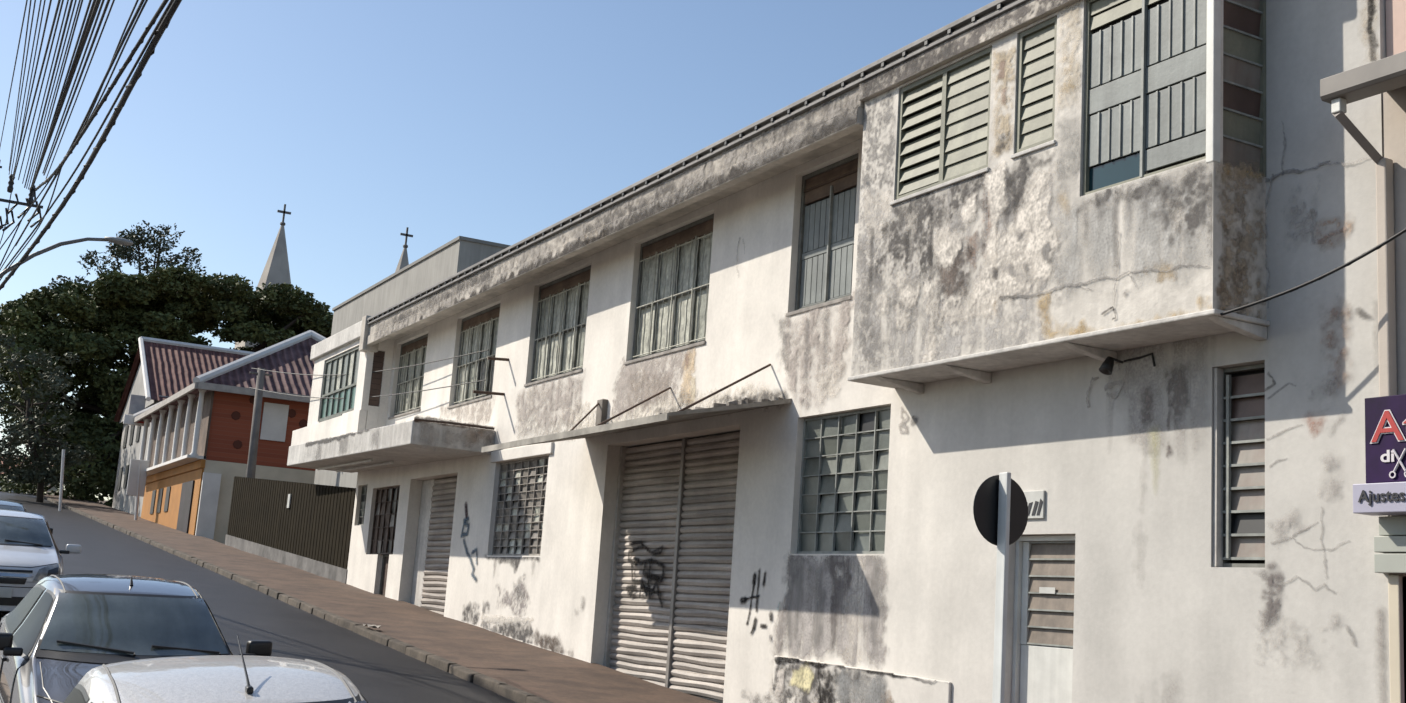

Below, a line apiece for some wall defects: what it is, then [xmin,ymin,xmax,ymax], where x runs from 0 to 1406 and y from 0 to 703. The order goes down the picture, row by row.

leakage [374,0,1211,408]
crack [999,242,1207,300]
crack [1265,138,1362,304]
leakage [1124,340,1206,454]
leakage [462,557,563,653]
leakage [753,555,886,703]